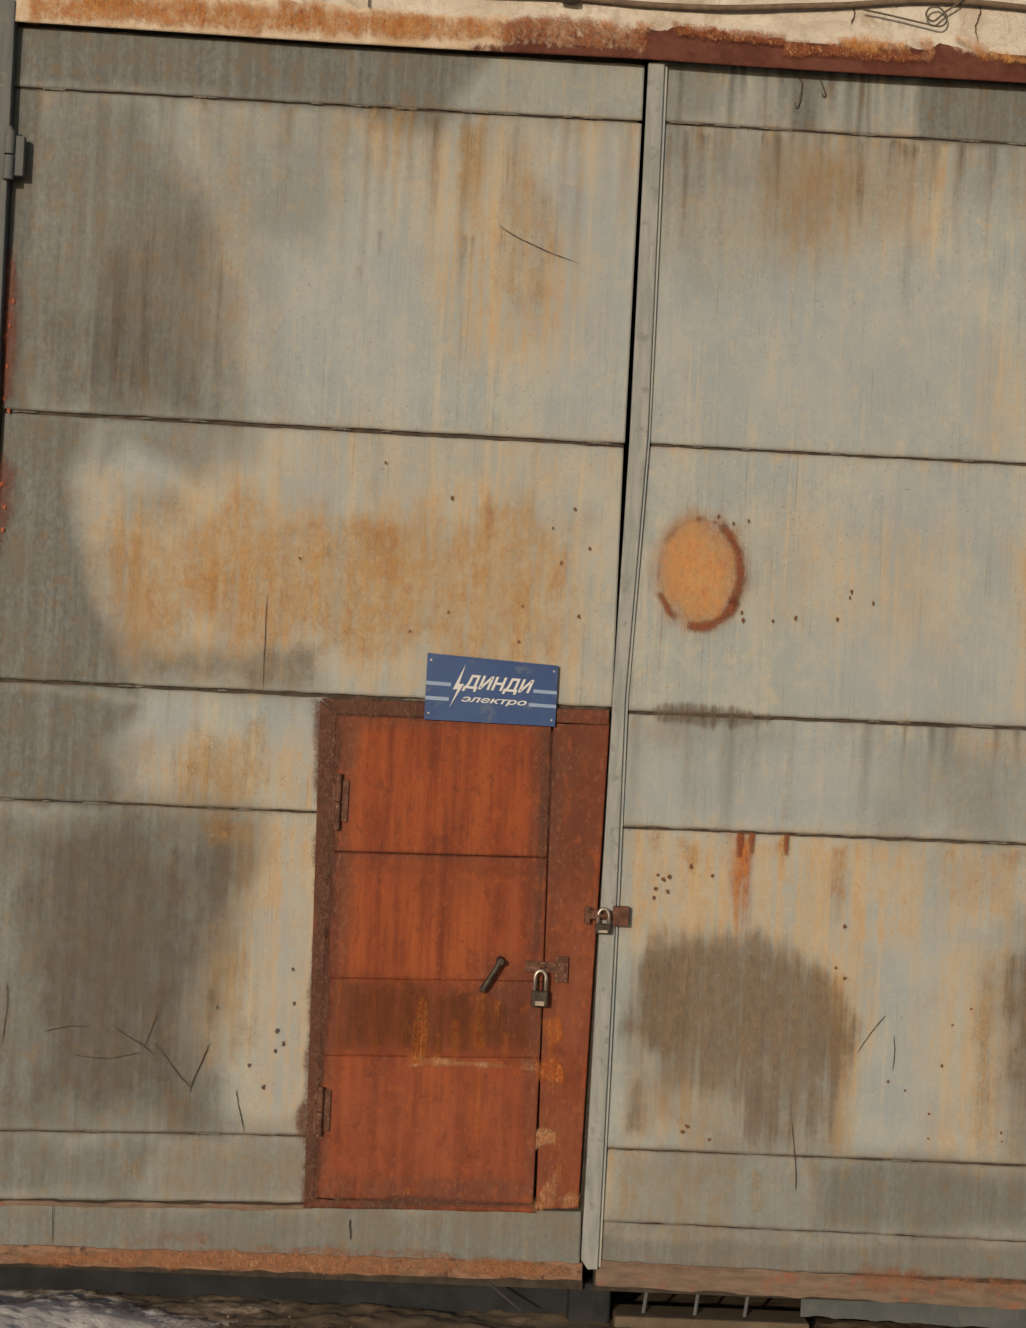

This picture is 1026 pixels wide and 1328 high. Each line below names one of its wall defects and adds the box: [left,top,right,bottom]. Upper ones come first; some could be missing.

rust [30,0,647,49]
rust [659,514,750,631]
rust [734,833,755,902]
water stain [626,934,855,1130]
rust [22,1236,567,1276]